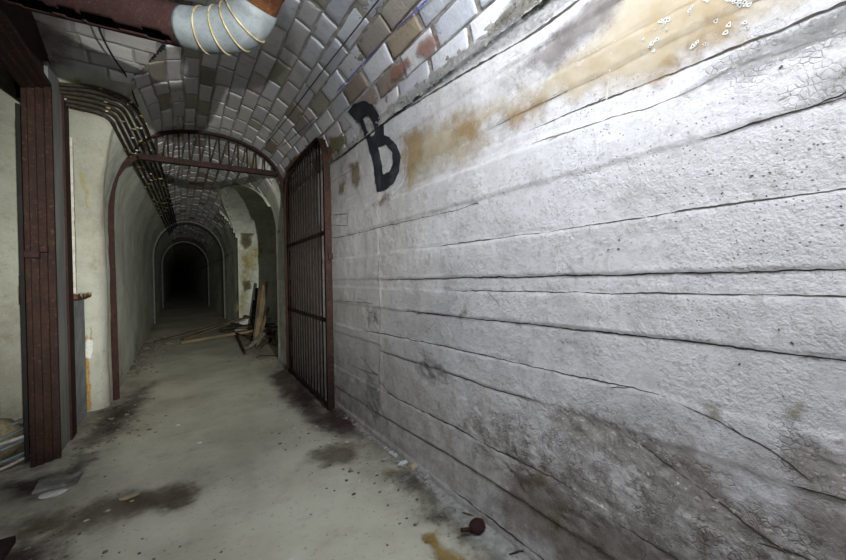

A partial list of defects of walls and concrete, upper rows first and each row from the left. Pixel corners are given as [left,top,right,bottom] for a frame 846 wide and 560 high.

crack [332,0,579,182]
water stain [529,0,741,99]
crack [494,1,846,143]
water stain [401,114,487,188]
crack [422,188,846,248]
crack [331,202,846,501]
water stain [407,473,529,560]
water stain [512,477,637,560]